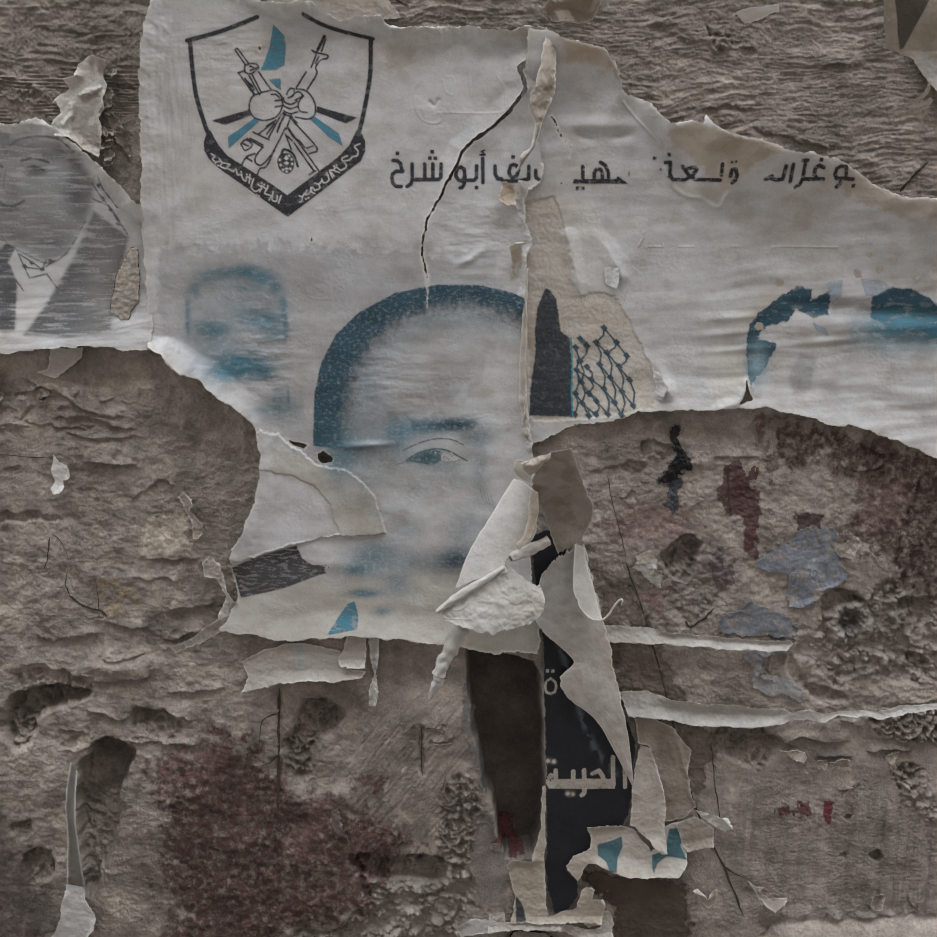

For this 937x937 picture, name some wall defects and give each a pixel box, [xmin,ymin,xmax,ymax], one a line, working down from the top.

spalling [0,76,52,107]
flaking render [100,70,132,166]
spalling [632,534,703,588]
spalling [718,527,937,702]
spalling [10,819,56,885]
spalling [0,683,92,755]
spalling [75,736,136,897]
spalling [277,697,346,788]
peeling [292,649,547,937]
spalling [708,726,851,774]
spalling [868,849,884,863]
spalling [885,752,925,799]